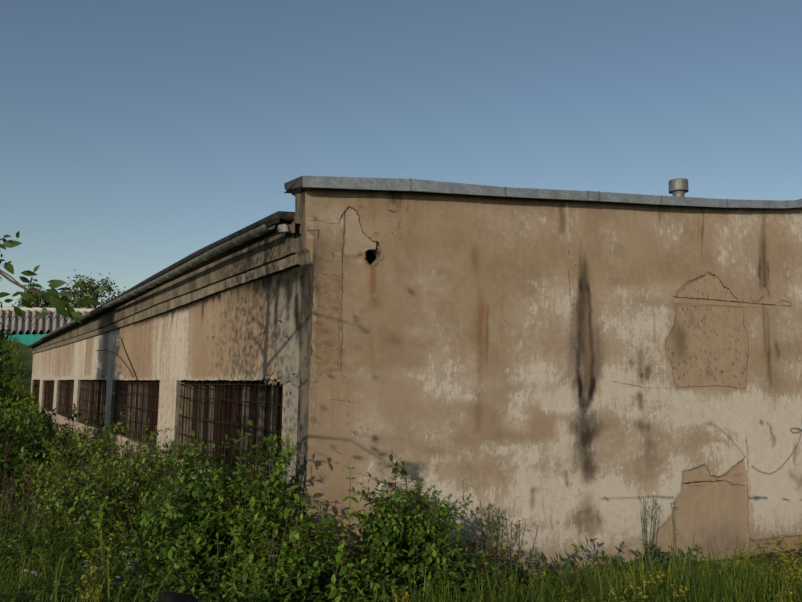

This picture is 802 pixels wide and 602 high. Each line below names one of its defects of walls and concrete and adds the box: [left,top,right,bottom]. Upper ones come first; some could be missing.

spalling [331,206,384,268]
water stain [237,255,314,335]
spalling [673,271,791,309]
water stain [576,278,596,471]
spalling [663,458,747,524]